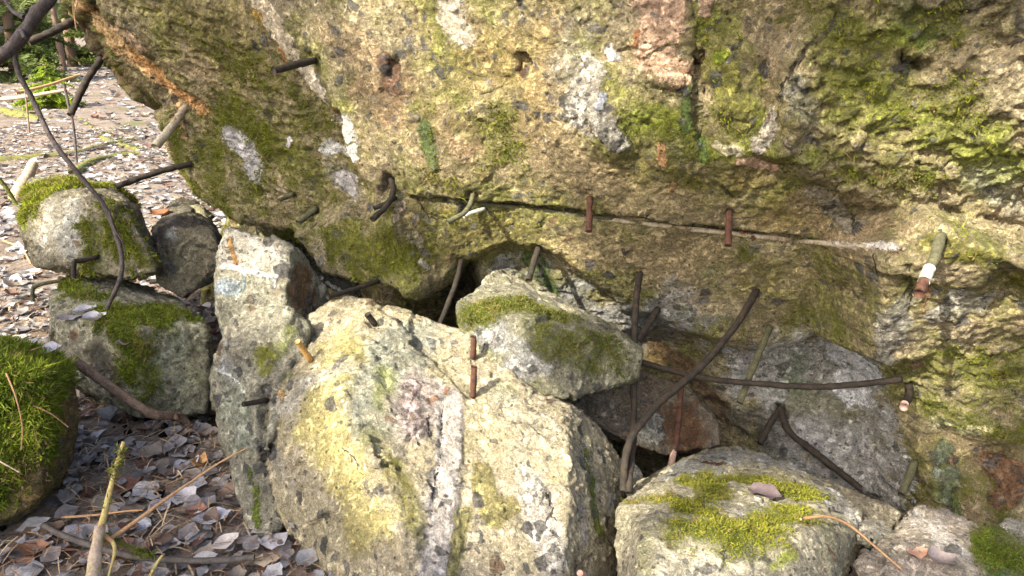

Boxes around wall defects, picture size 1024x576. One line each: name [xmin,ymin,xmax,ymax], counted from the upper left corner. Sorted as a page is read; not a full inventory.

crack [502,202,798,236]